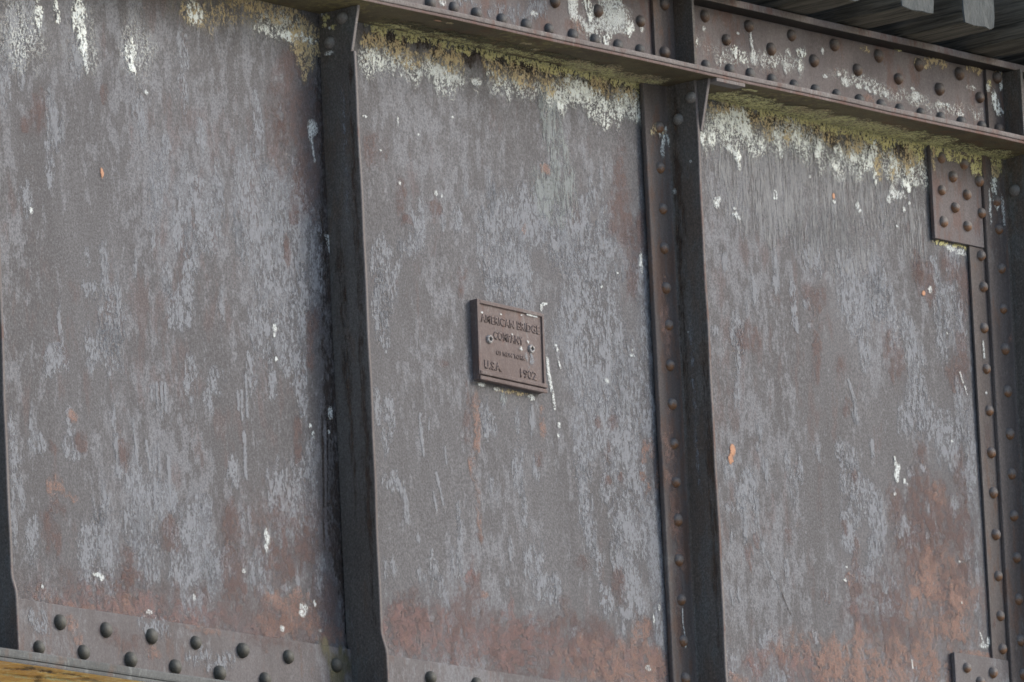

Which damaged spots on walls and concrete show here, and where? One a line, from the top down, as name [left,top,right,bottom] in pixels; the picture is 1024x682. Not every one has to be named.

efflorescence [12,11,37,63]
peeling [0,0,61,108]
leakage [358,27,641,230]
leakage [586,3,624,45]
leakage [700,99,967,278]
efflorescence [843,71,924,106]
peeling [77,0,328,618]
peeling [8,409,47,565]
peeling [476,154,667,660]
peeling [802,238,981,634]
corrosion [115,593,170,635]
corrosion [186,626,236,672]